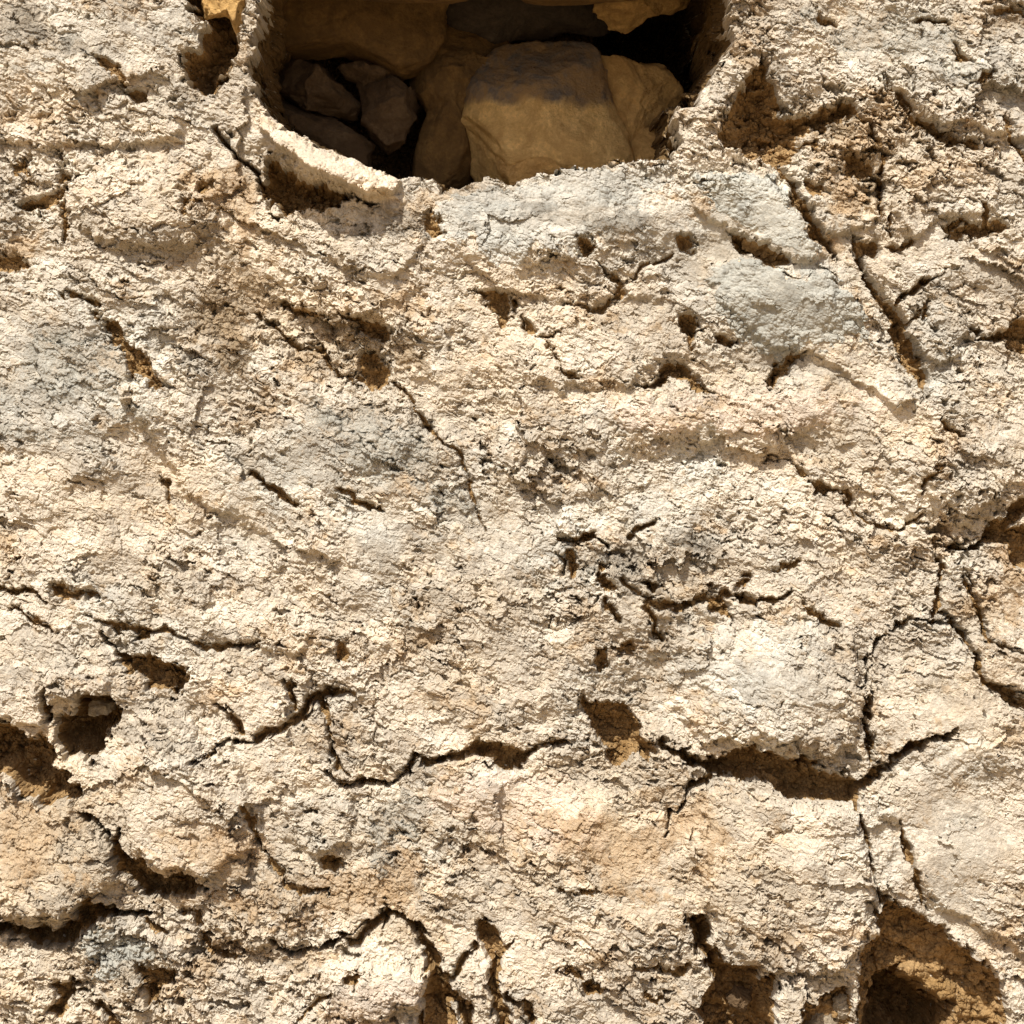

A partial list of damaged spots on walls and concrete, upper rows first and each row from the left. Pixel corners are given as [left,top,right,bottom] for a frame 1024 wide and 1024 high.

spalling [249,0,426,179]
spalling [423,0,731,269]
crack [773,164,933,399]
crack [620,573,791,619]
crack [863,546,1024,709]
crack [196,681,572,787]
crack [273,896,537,1024]